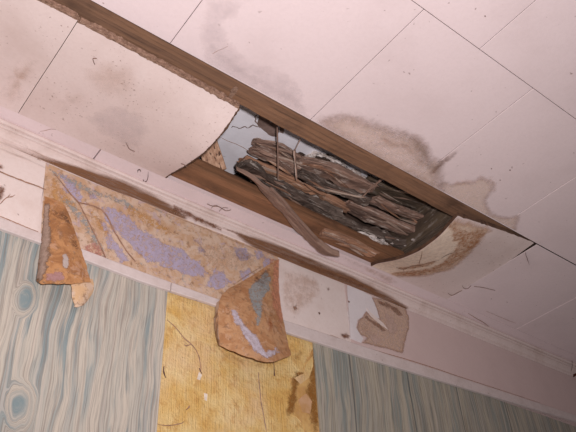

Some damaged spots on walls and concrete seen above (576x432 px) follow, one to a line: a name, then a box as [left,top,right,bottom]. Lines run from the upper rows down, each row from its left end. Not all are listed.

peeling [231,114,284,137]
damp [373,221,487,276]
peeling [347,285,387,343]